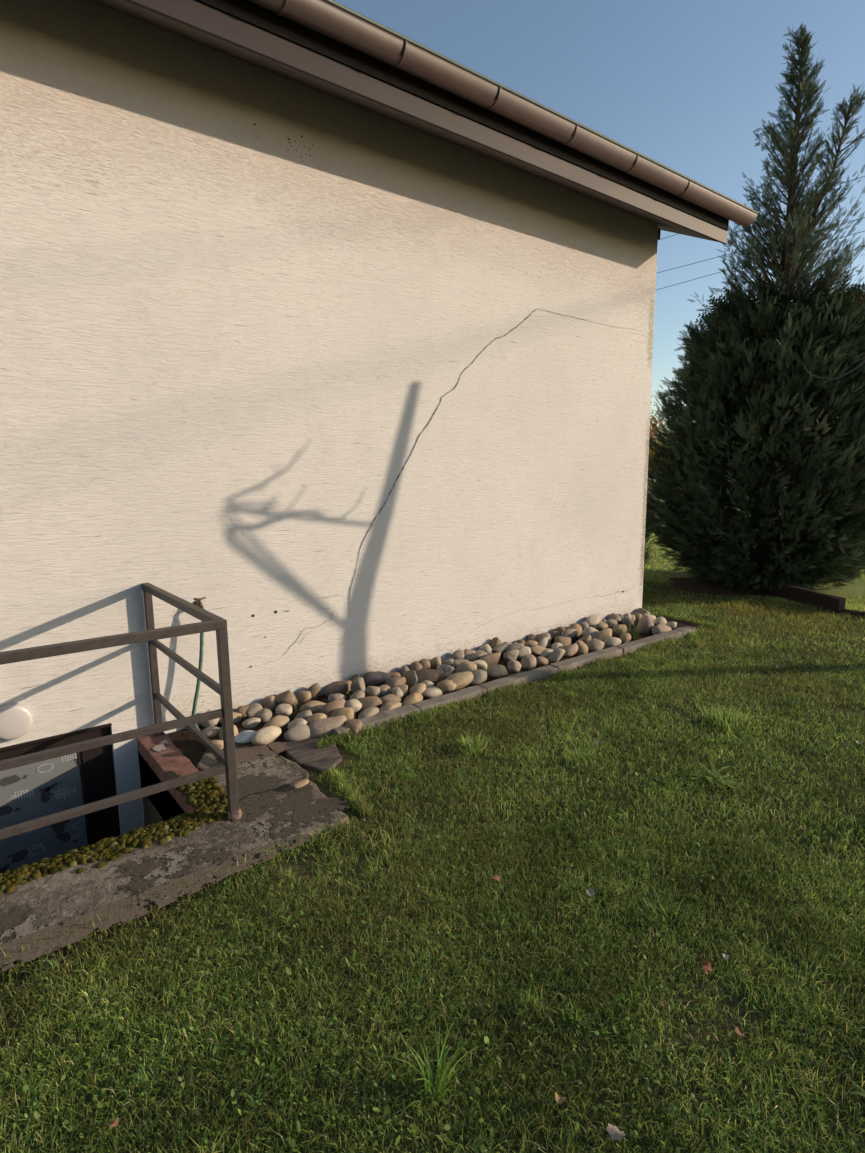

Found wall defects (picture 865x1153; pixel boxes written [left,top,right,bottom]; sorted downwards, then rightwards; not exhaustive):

crack [256,309,643,666]